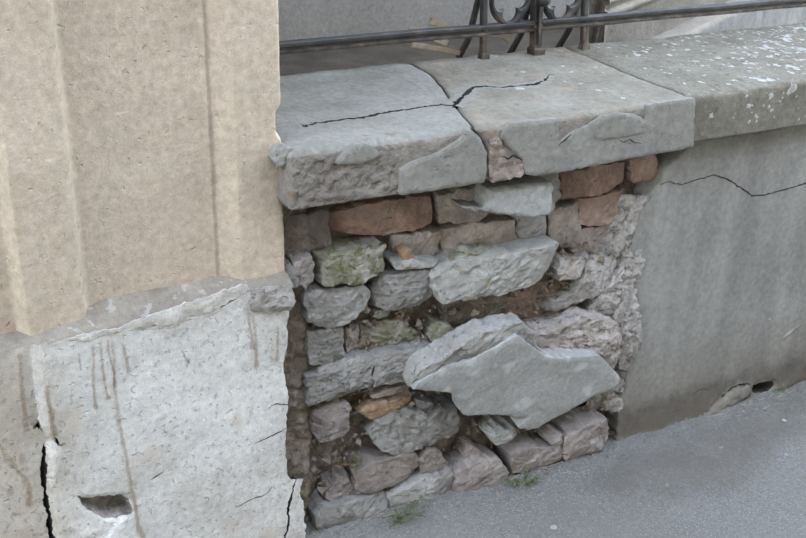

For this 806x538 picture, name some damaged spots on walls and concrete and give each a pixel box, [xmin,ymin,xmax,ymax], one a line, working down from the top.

crack [301,74,555,127]
crack [660,174,806,198]
flaking render [600,194,651,265]
flaking render [402,312,629,430]
spalling [706,378,777,416]
crack [32,423,66,538]
spalling [75,492,137,523]
crack [236,476,303,538]